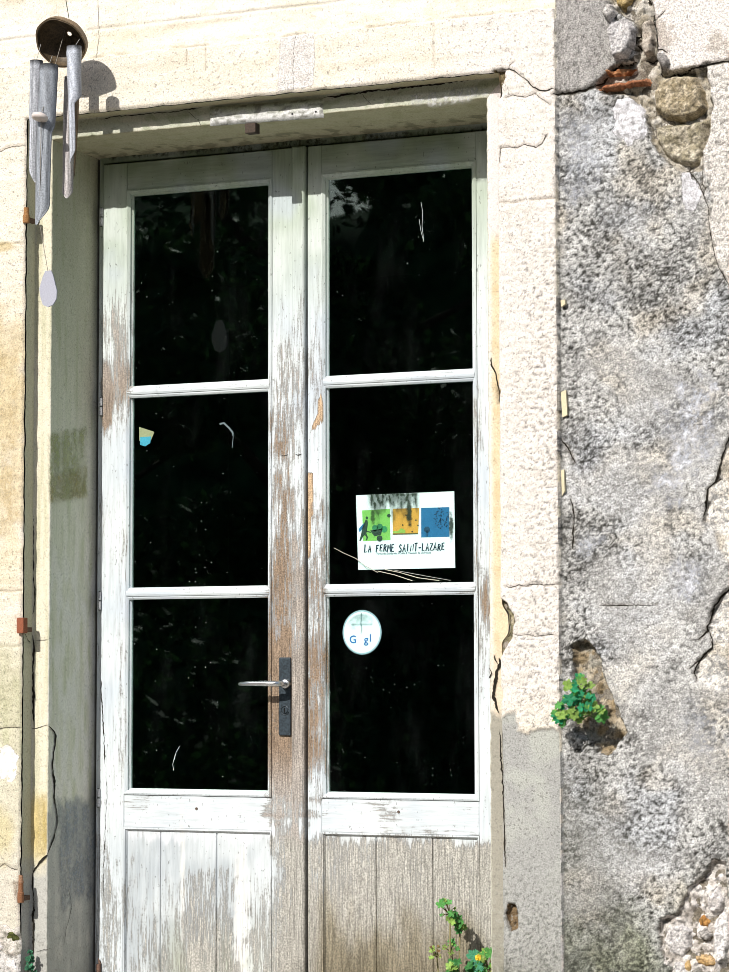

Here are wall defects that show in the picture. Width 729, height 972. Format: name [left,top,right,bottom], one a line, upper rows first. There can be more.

spalling [595,0,714,211]
damp [49,429,87,500]
crack [703,437,729,519]
crack [30,516,38,612]
crack [689,589,729,681]
spalling [572,639,627,756]
crack [0,634,72,954]
peeling [0,924,22,972]
spalling [659,859,729,972]